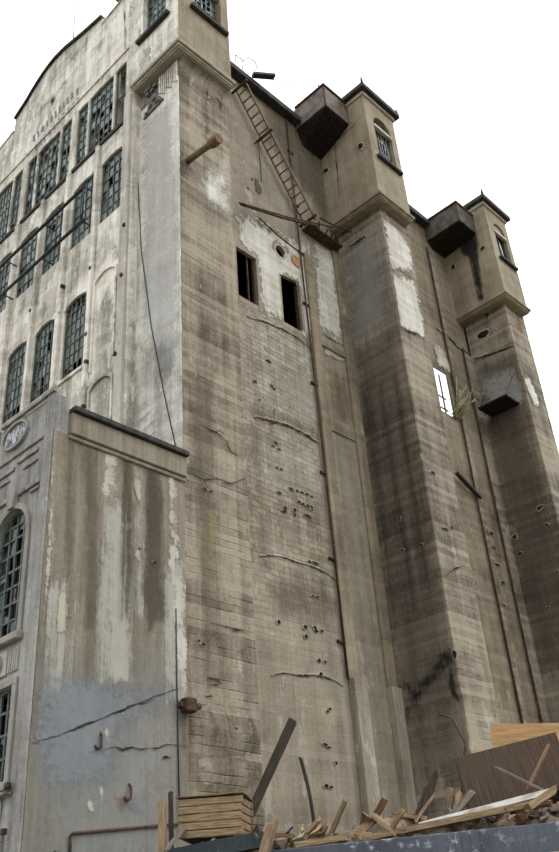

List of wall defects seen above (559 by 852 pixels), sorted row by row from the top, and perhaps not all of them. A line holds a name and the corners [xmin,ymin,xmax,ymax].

peeling [203,173,345,427]
peeling [384,219,426,339]
peeling [432,344,452,375]
crack [195,425,246,487]
crack [253,410,319,443]
peeling [259,432,324,518]
leakage [28,449,186,852]
crack [32,686,186,743]
crack [203,678,222,722]
crack [271,670,344,686]
leakage [405,649,458,718]
crack [93,744,185,759]